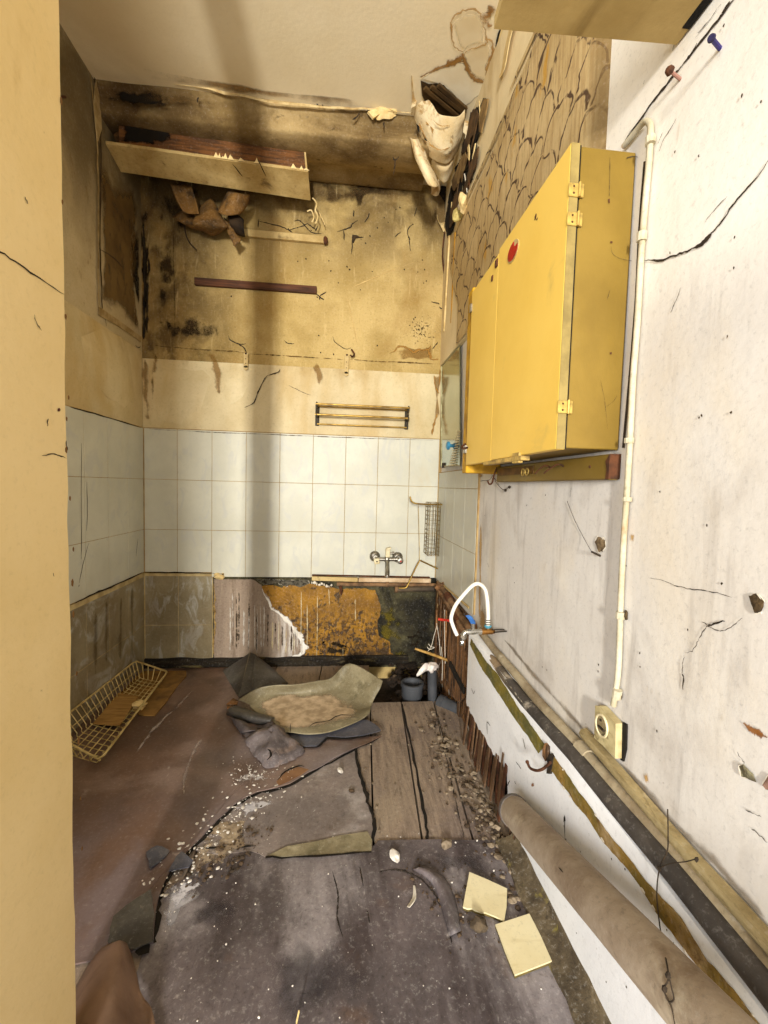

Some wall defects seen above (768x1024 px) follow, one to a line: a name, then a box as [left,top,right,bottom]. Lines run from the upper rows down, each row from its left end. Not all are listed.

water stain [110,90,187,106]
water stain [208,81,281,95]
water stain [421,5,495,105]
peeling [410,76,489,236]
crack [644,161,768,262]
crack [0,251,63,294]
water stain [101,174,174,339]
water stain [166,319,217,336]
crack [136,336,438,407]
peeling [213,573,392,658]
crack [652,578,742,689]